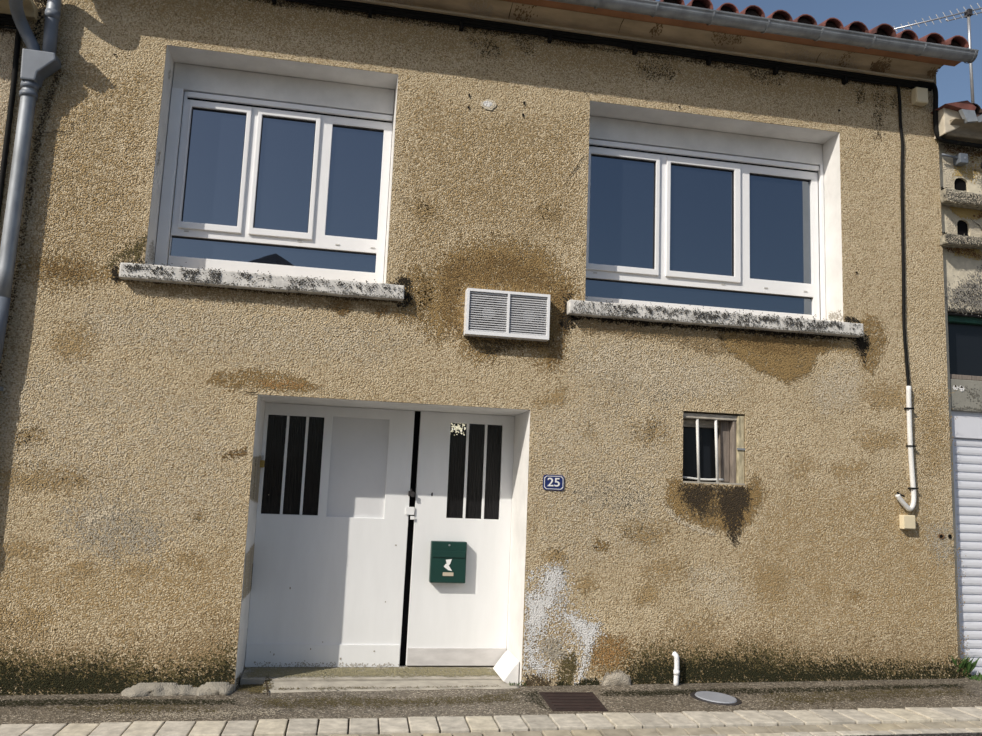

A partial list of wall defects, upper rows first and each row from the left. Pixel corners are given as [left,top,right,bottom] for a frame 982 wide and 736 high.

water stain [15,39,906,416]
water stain [0,422,107,501]
water stain [0,506,245,695]
water stain [522,544,607,685]
water stain [611,383,972,684]